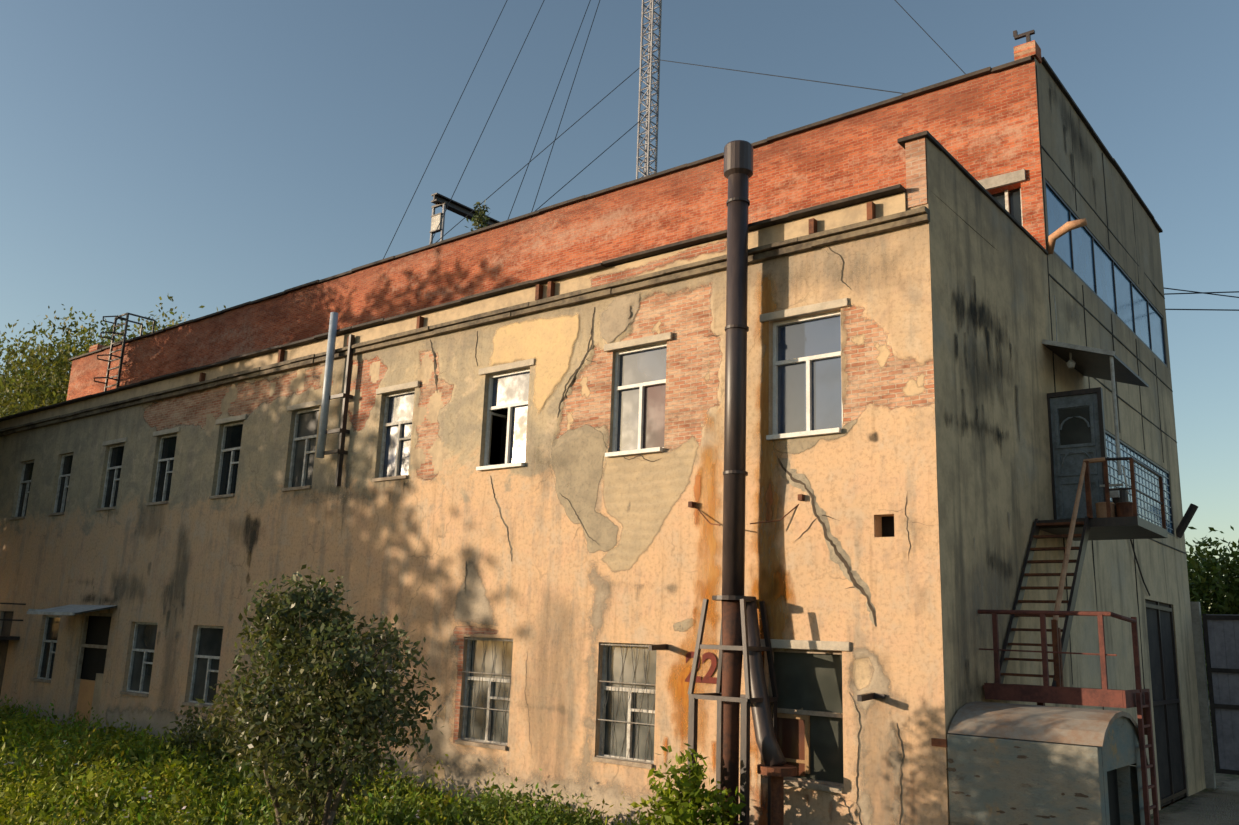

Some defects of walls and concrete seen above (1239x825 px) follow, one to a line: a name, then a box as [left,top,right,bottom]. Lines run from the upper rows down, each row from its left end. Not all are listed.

flaking render [143,365,333,437]
damp [245,518,259,580]
flaking render [348,356,388,431]
flaking render [410,351,454,480]
crack [490,476,513,561]
flaking render [557,283,722,450]
rust [669,452,719,738]
rust [753,276,791,668]
crack [776,456,877,626]
flaking render [842,305,935,424]
damp [953,283,1012,376]